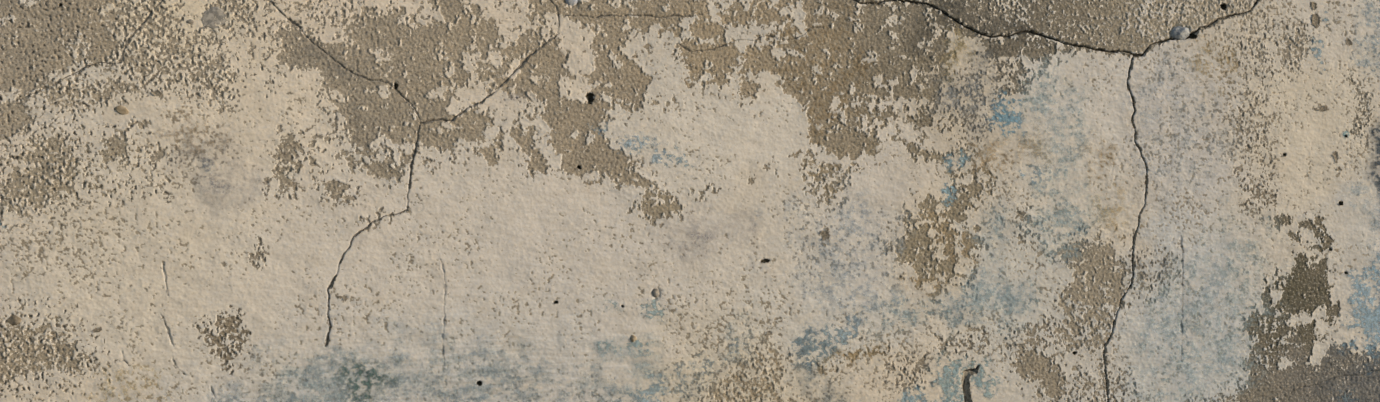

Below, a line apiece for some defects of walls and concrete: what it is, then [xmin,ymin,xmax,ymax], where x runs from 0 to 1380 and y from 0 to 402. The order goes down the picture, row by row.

crack [19,0,163,100]
crack [267,0,818,346]
peeling [0,0,1321,304]
crack [855,0,1261,402]
peeling [0,292,124,402]
peeling [680,202,1184,402]
peeling [1183,211,1380,402]